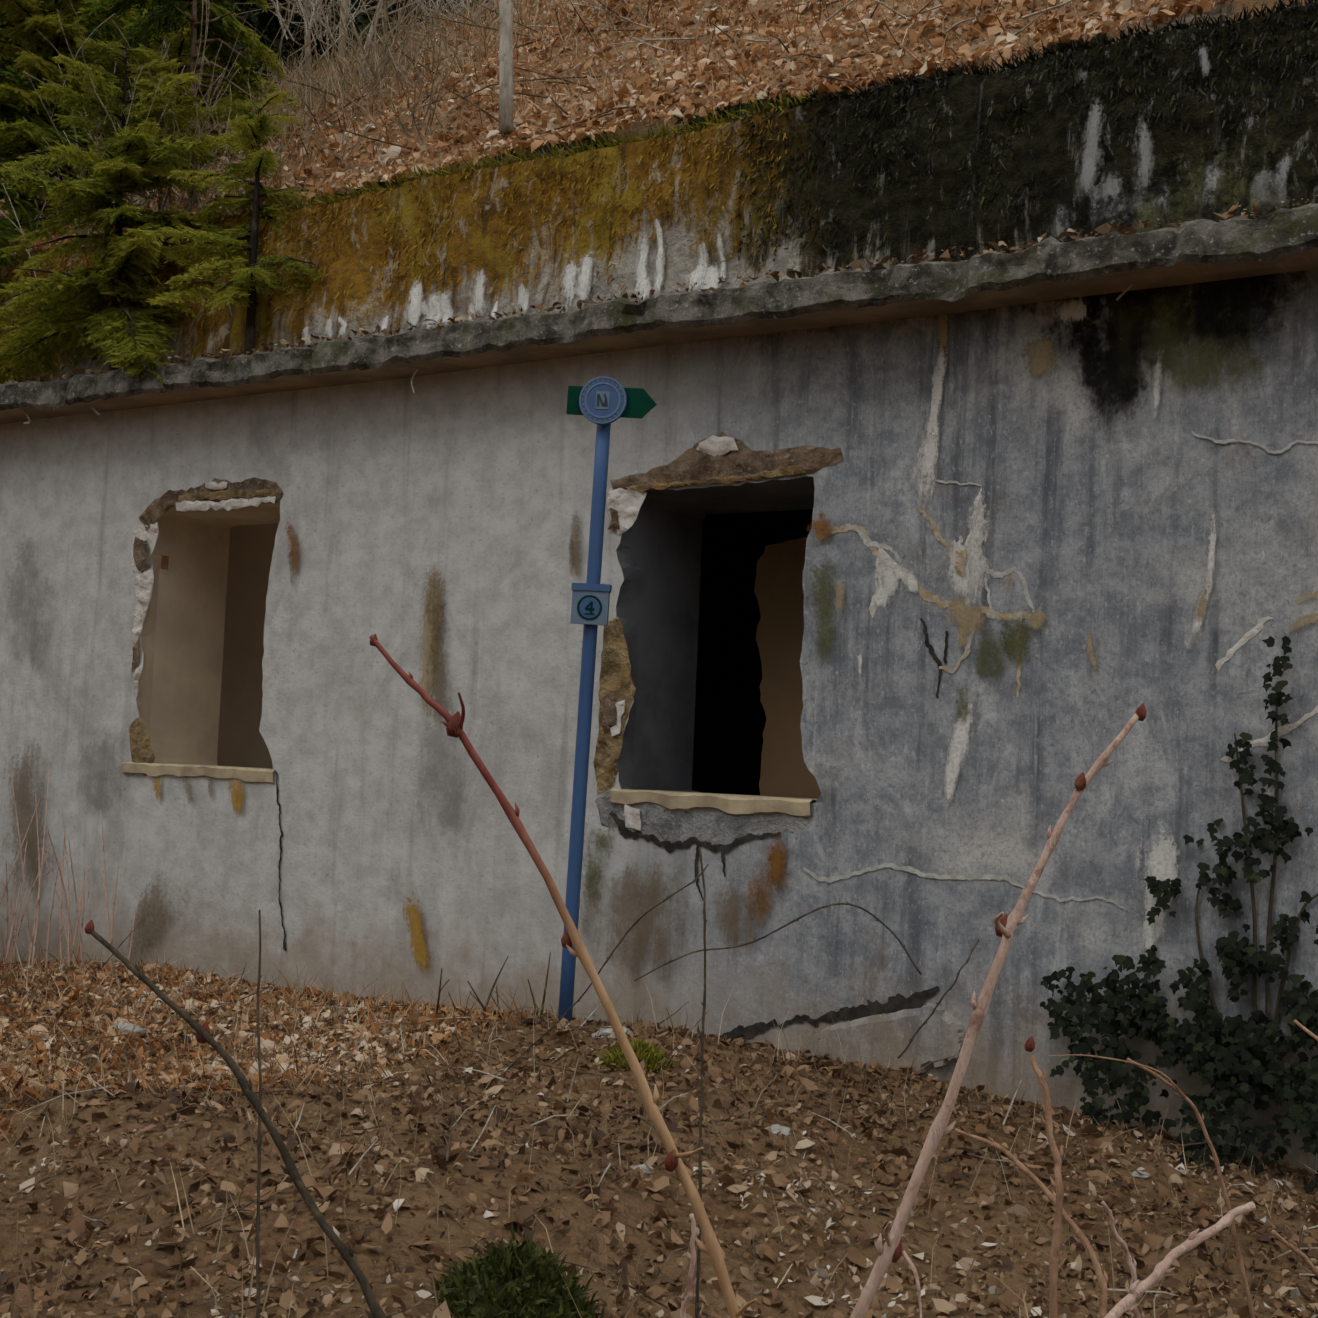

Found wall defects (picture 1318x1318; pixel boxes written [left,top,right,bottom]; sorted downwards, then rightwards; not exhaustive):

leakage [1025,99,1317,241]
leakage [404,270,498,329]
leakage [561,252,593,305]
leakage [635,216,665,300]
leakage [689,234,726,293]
leakage [1024,271,1302,425]
crack [1192,431,1318,454]
spalling [593,617,810,846]
rust [230,779,244,813]
crack [609,811,781,900]
crack [803,863,1127,910]
crack [720,986,940,1041]